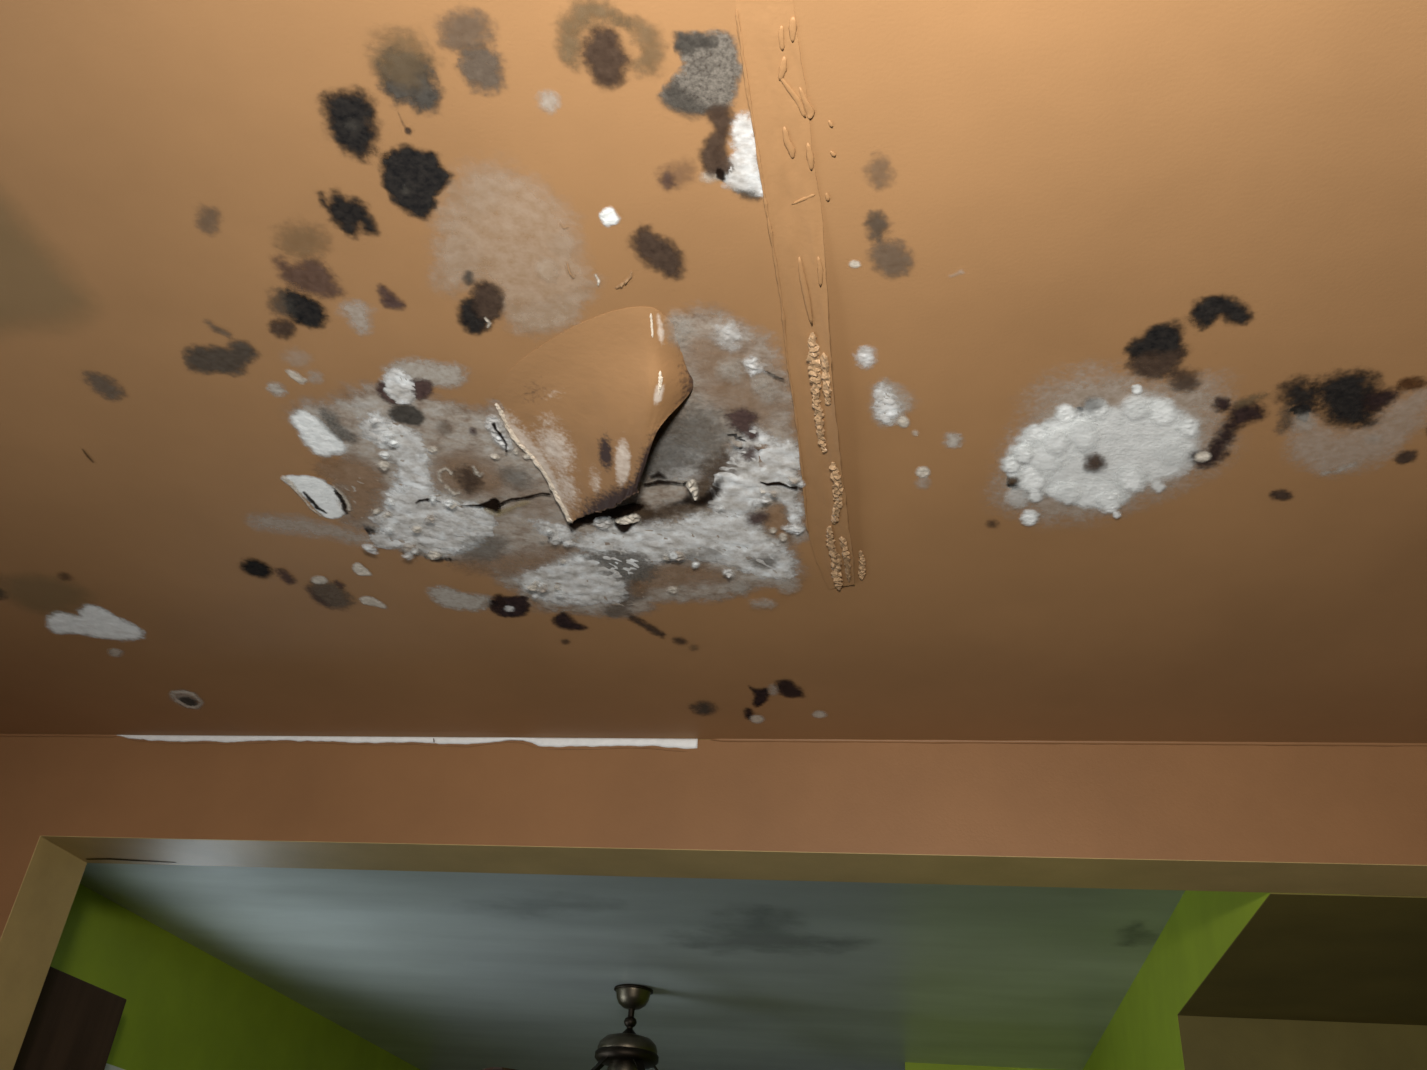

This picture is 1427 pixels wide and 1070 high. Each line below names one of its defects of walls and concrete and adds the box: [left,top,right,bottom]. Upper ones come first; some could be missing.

mould [561,2,742,179]
mould [321,91,452,219]
mould [319,191,377,235]
mould [459,272,503,334]
leakage [1003,296,1265,525]
leakage [1280,370,1426,428]
crack [415,493,551,514]
flaking render [281,312,808,617]
crack [760,481,797,490]
spalling [806,332,866,590]
peeling [47,605,143,656]
peeling [117,735,698,752]